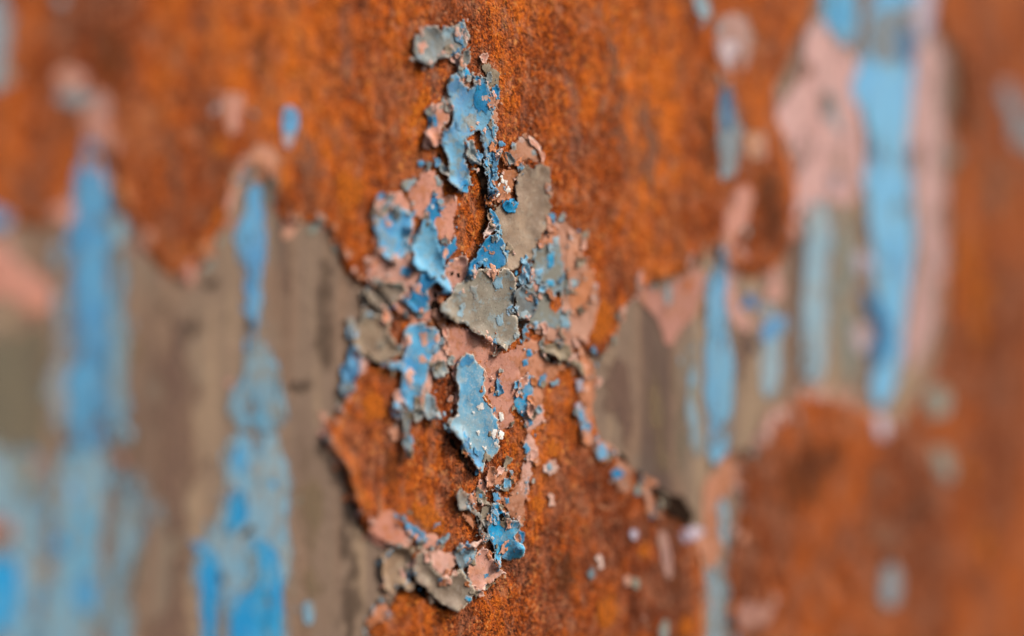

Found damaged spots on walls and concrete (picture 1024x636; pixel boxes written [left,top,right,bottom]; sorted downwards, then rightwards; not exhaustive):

corrosion [0,0,813,636]
peeling [339,19,673,636]